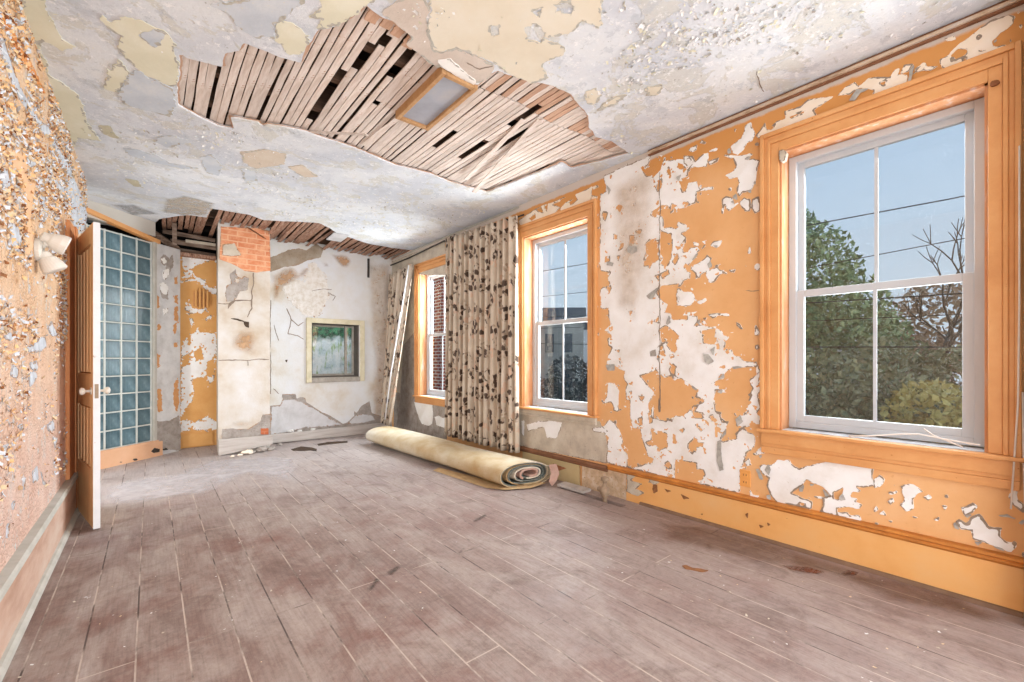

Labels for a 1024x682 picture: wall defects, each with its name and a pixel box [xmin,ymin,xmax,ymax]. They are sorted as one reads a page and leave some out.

peeling [0,0,1022,538]
crack [218,273,303,394]
peeling [953,491,1024,557]